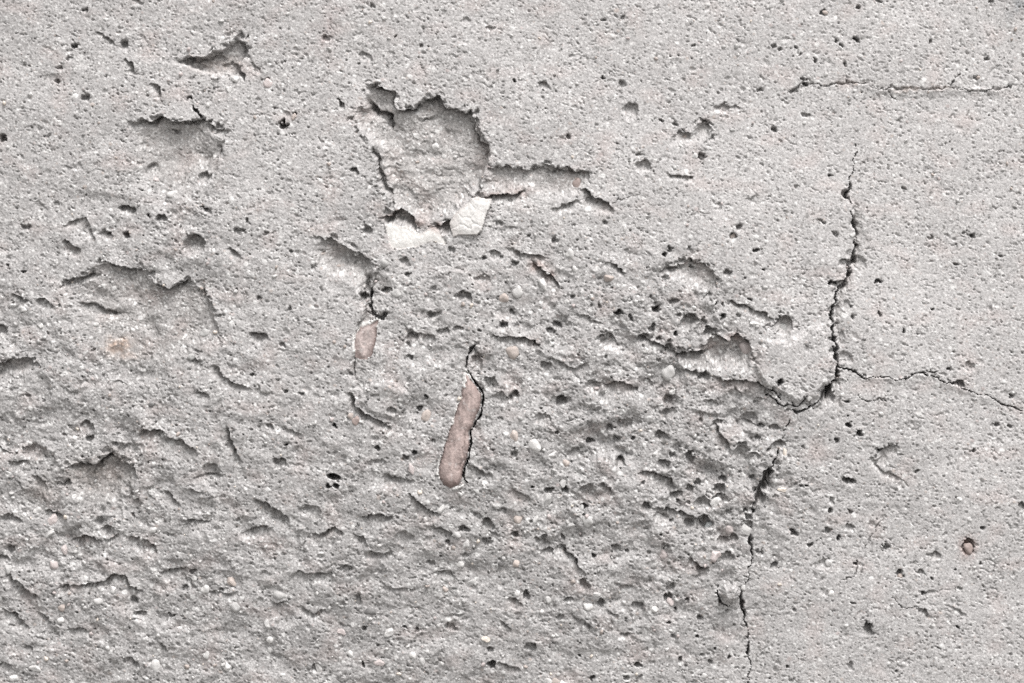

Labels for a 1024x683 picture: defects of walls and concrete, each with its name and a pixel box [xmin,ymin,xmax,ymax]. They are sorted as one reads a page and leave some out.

spalling [337,80,613,237]
crack [794,74,1014,105]
crack [462,344,485,485]
crack [715,133,1022,683]